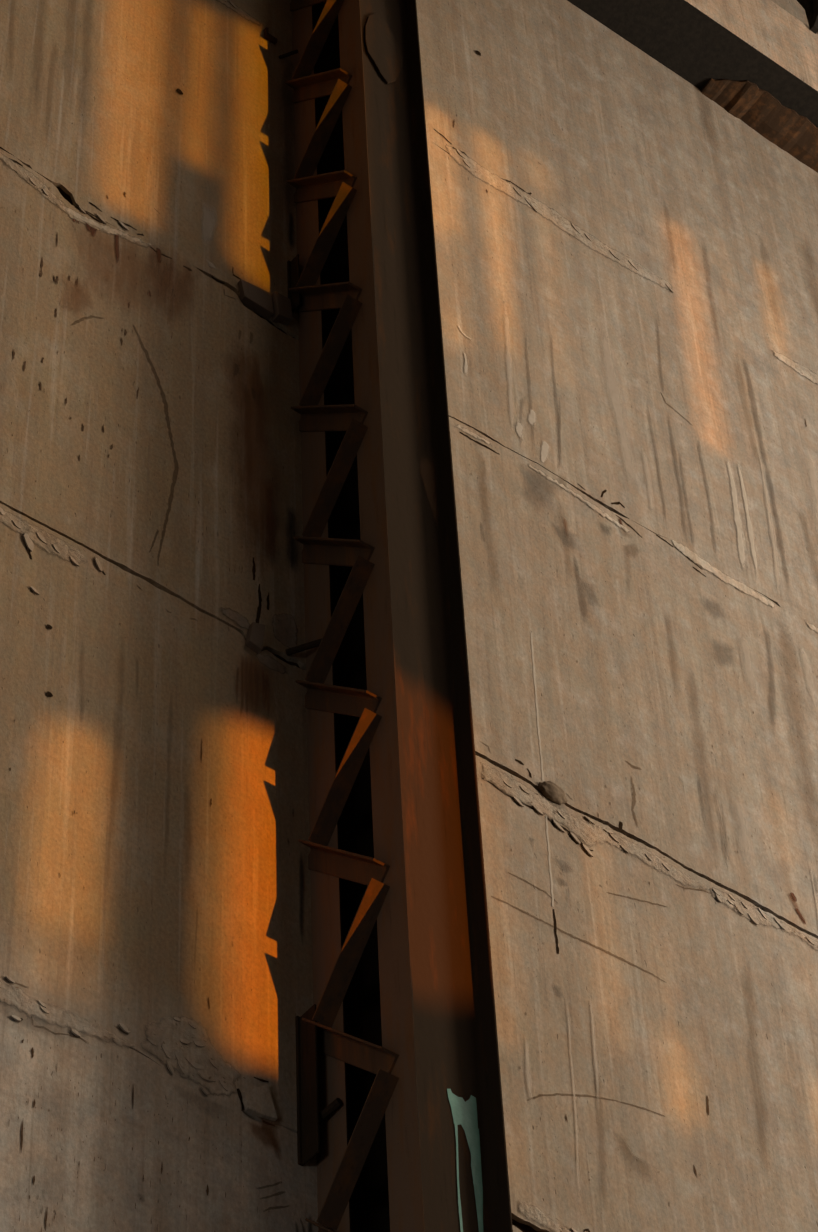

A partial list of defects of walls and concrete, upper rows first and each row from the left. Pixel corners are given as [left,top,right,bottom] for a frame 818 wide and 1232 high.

crack [48,187,294,338]
crack [459,431,500,455]
crack [577,483,706,577]
crack [252,557,305,670]
crack [482,743,640,851]
crack [495,873,665,982]
crack [608,885,708,907]
crack [18,1016,84,1041]
crack [237,1077,275,1126]
crack [512,1219,537,1232]